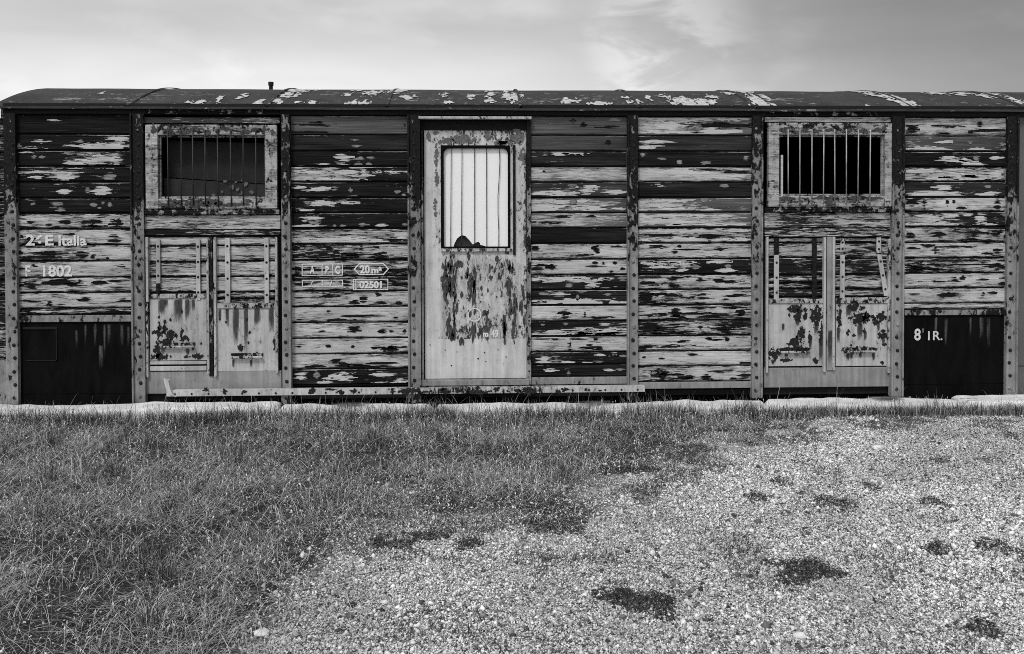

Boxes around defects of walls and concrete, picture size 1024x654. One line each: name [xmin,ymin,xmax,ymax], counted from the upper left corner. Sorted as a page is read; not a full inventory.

peeling [174,89,318,104]
peeling [467,90,524,104]
peeling [561,90,777,106]
peeling [851,91,1024,109]
peeling [639,118,752,187]
peeling [17,136,131,313]
peeling [905,121,1006,297]
rust [150,299,204,361]
peeling [291,139,499,395]
rust [440,251,526,362]
peeling [531,184,751,380]
rust [768,303,887,365]